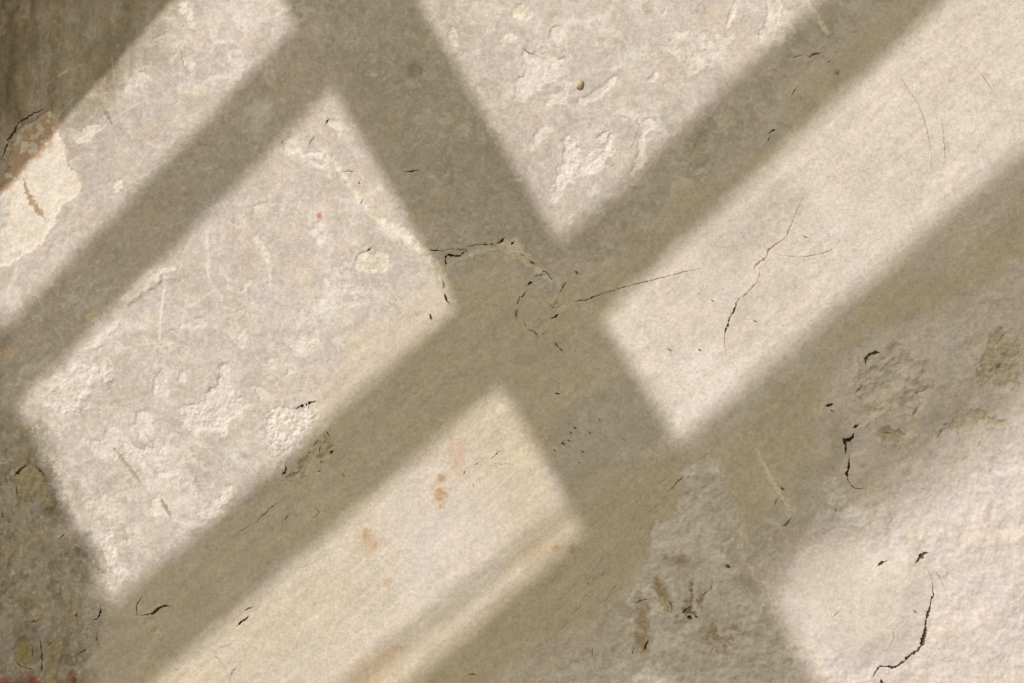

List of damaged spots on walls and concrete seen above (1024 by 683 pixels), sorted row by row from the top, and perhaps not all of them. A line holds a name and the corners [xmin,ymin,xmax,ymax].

flaking render [0,0,216,278]
crack [272,109,705,324]
crack [720,191,845,356]
crack [821,399,874,493]
crack [868,548,947,683]